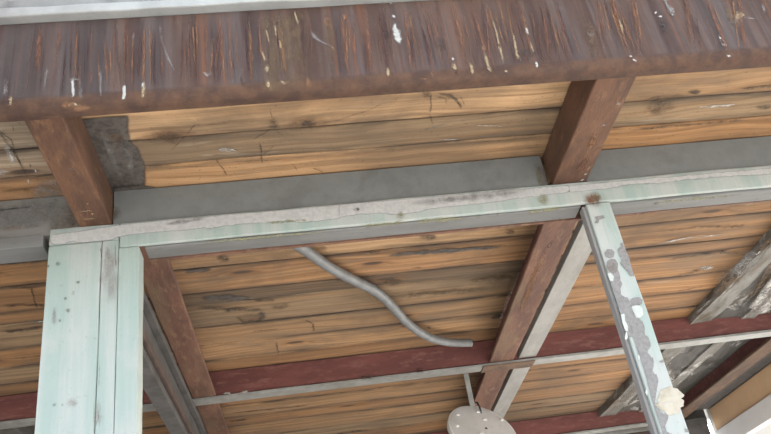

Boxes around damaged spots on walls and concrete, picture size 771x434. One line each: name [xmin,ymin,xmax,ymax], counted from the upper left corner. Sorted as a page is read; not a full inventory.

corrosion [62,30,163,110]
corrosion [181,11,312,87]
corrosion [453,5,580,74]
corrosion [597,0,641,61]
water stain [82,116,154,194]
water stain [741,264,771,313]
peeling [605,243,684,434]